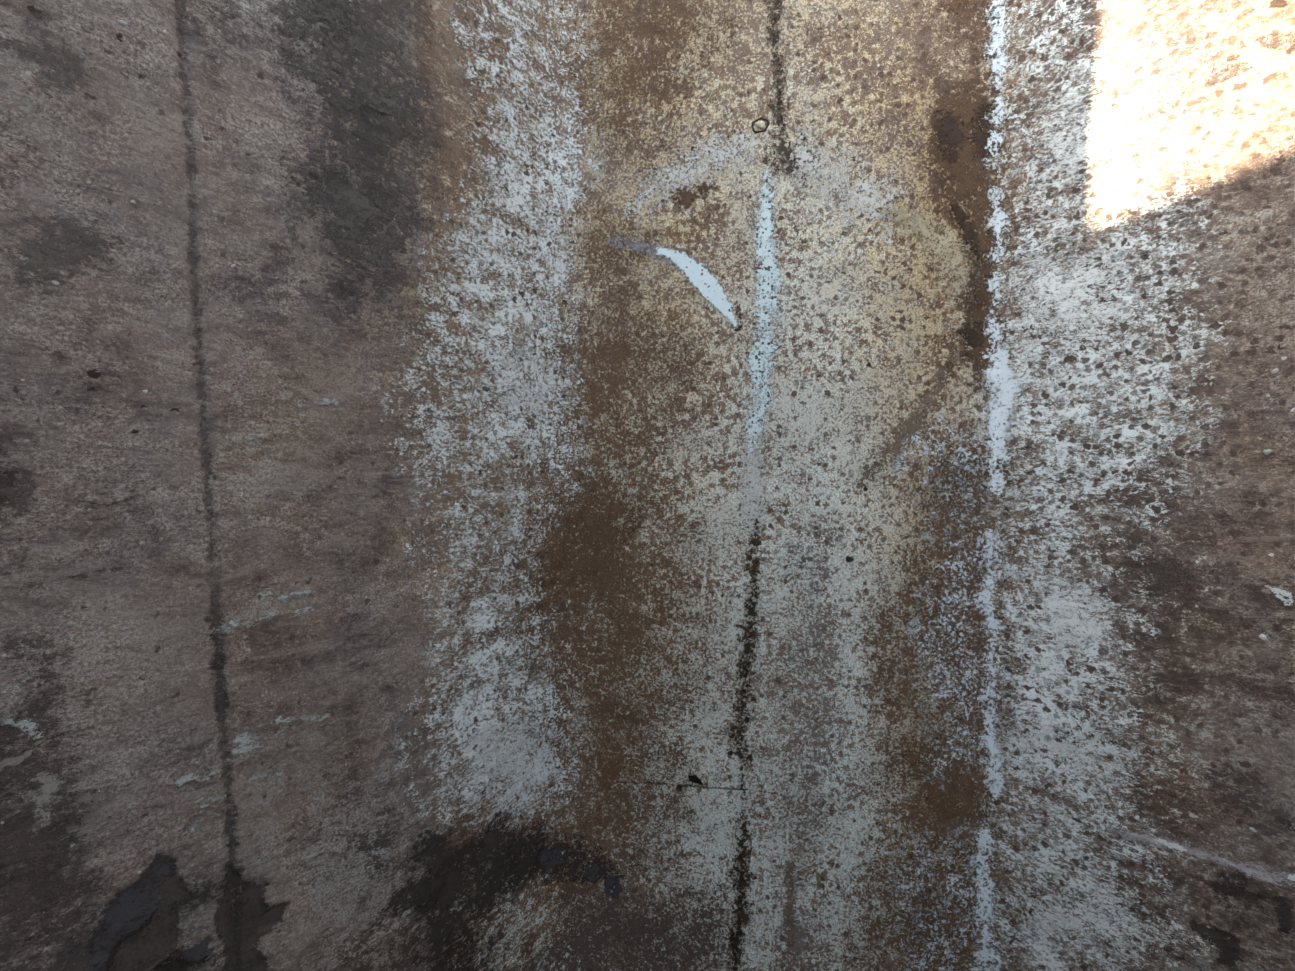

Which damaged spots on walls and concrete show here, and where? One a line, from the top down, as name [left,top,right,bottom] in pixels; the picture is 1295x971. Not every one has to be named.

corrosion [551,0,738,158]
crack [763,0,802,176]
water stain [1205,53,1255,84]
water stain [1260,31,1295,53]
water stain [257,0,446,343]
corrosion [671,181,714,209]
corrosion [513,211,723,883]
corrosion [843,414,1030,971]
water stain [381,805,751,971]